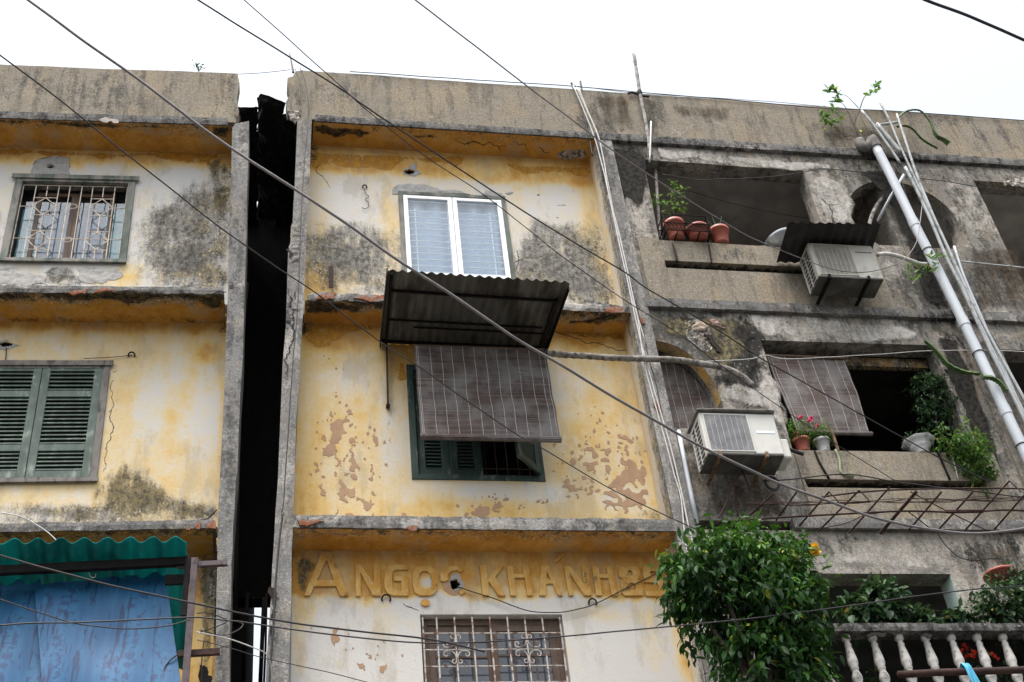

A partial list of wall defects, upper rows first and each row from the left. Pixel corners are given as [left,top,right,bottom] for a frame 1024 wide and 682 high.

leakage [89,152,226,275]
leakage [316,222,385,284]
leakage [521,221,607,292]
flaking render [680,316,727,354]
leakage [663,312,917,423]
crack [104,370,117,464]
leakage [71,466,205,520]
peeling [310,392,392,516]
peeling [456,493,549,517]
peeling [553,406,648,513]